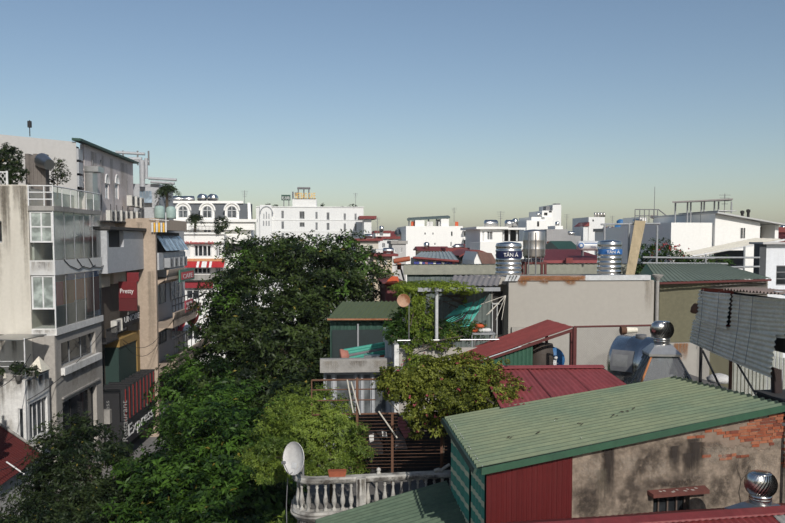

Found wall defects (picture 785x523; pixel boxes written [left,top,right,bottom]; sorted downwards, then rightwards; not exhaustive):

damp [578,448,615,515]
damp [670,439,722,470]
flaking render [687,414,785,468]